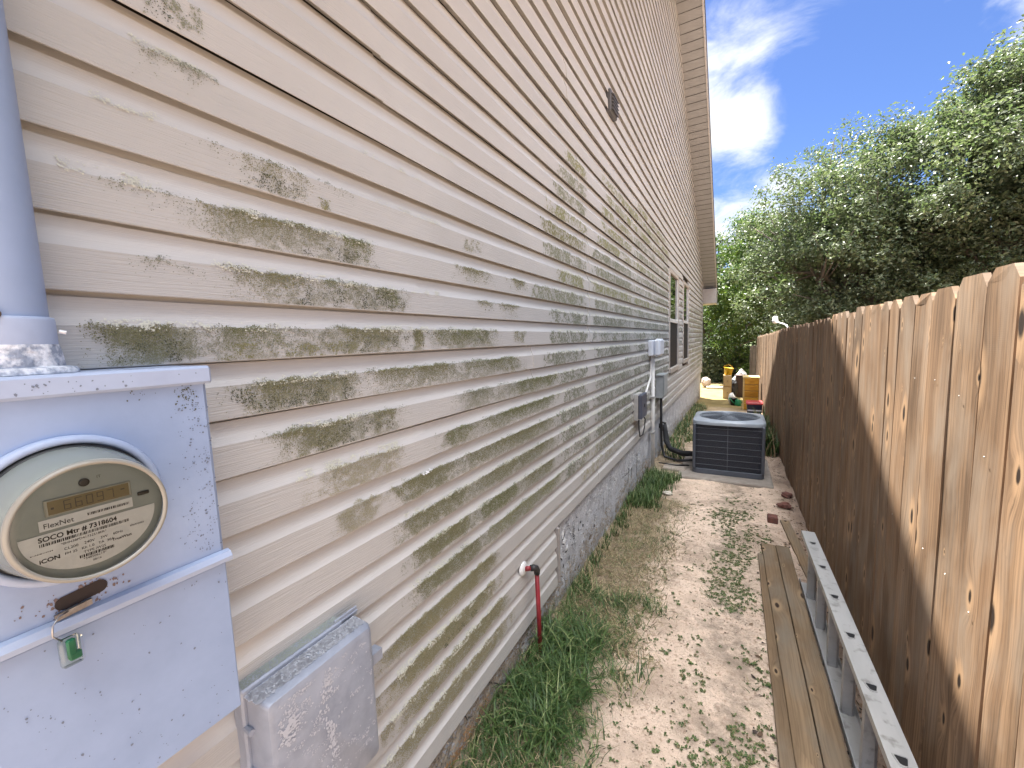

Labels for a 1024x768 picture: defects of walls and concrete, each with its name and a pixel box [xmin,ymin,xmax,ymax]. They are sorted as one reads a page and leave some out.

mould [218,336,413,361]
mould [231,377,361,412]
leakage [433,584,561,768]